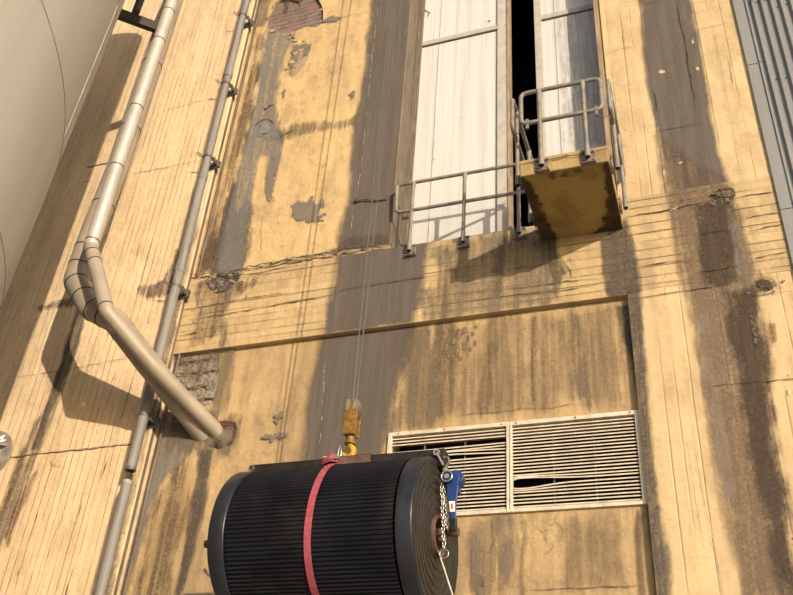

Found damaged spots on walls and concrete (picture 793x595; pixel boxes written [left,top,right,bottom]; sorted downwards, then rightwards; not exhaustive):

flaking render [266,0,341,72]
crack [659,0,733,131]
leakage [199,26,329,275]
peeling [291,196,327,224]
leakage [305,0,442,460]
spalling [708,187,736,207]
spalling [204,272,259,294]
leakage [639,0,793,595]
spalling [747,279,785,294]
crack [10,358,136,478]
spalling [172,352,222,407]
leakage [209,349,233,417]